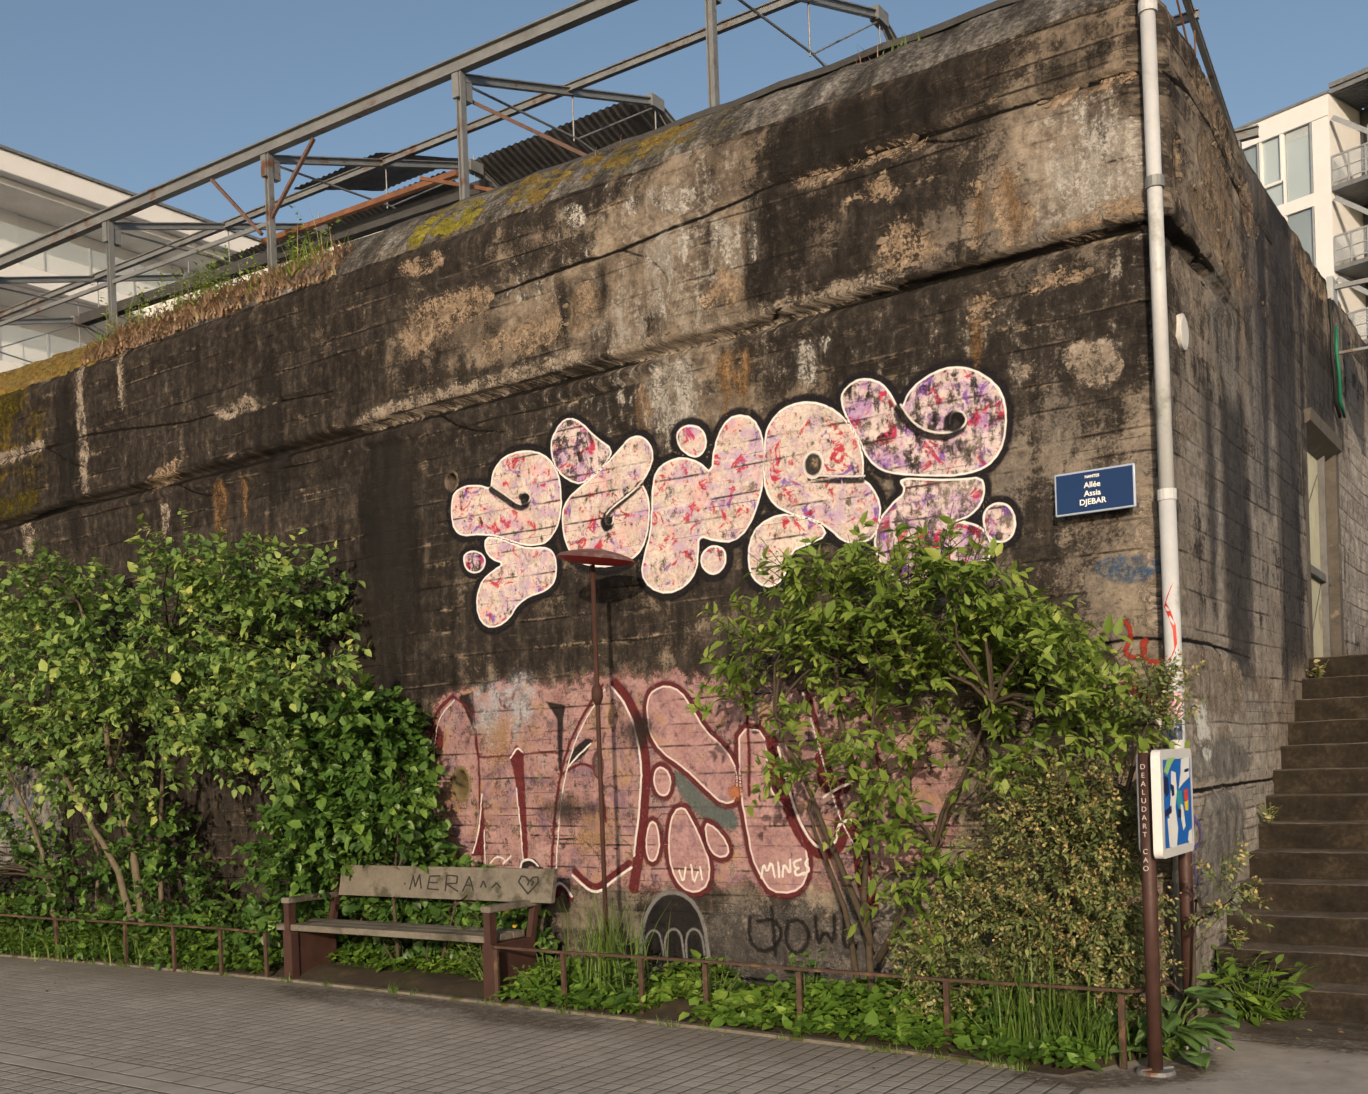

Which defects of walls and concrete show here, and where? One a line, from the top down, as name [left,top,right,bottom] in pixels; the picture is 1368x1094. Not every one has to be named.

leakage [712,83,951,311]
crack [432,70,1272,319]
leakage [1036,43,1107,95]
leakage [1046,97,1146,248]
crack [0,215,1232,531]
leakage [1204,164,1363,683]
leakage [20,522,35,557]